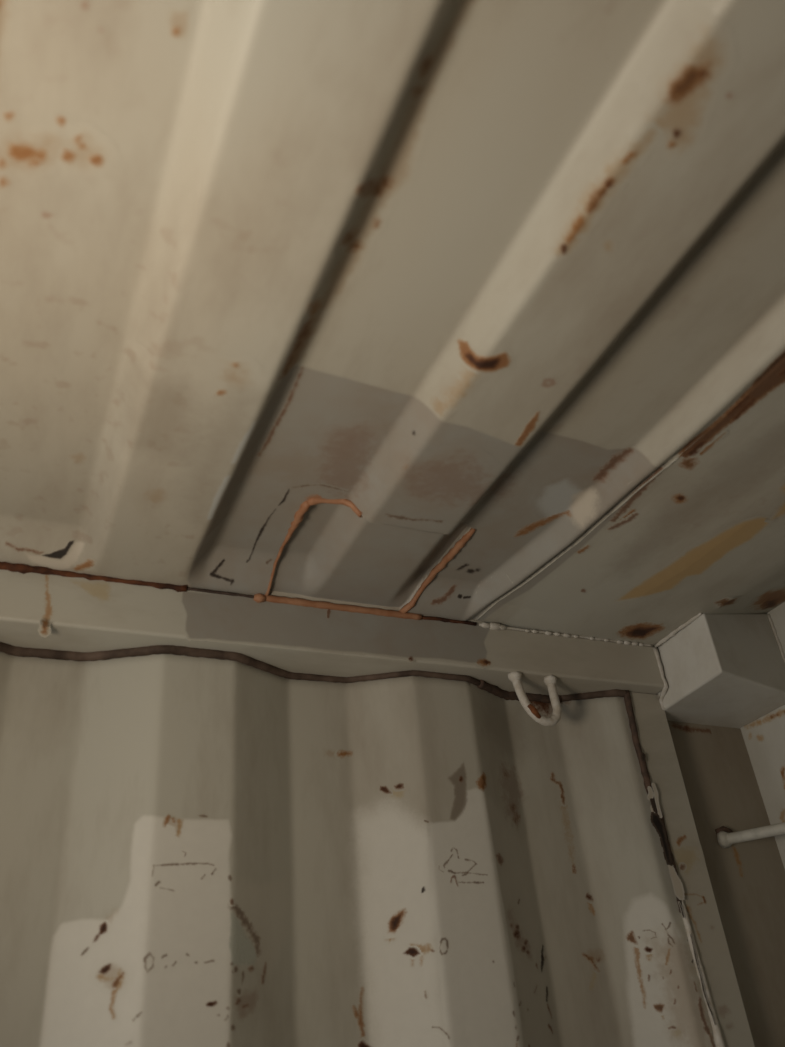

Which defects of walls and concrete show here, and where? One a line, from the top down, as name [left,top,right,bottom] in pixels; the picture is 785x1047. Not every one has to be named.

corrosion [0,107,121,191]
corrosion [545,6,739,263]
corrosion [271,0,490,387]
corrosion [425,334,515,421]
corrosion [604,345,785,533]
corrosion [612,620,669,642]
corrosion [710,586,785,613]
corrosion [380,905,437,969]